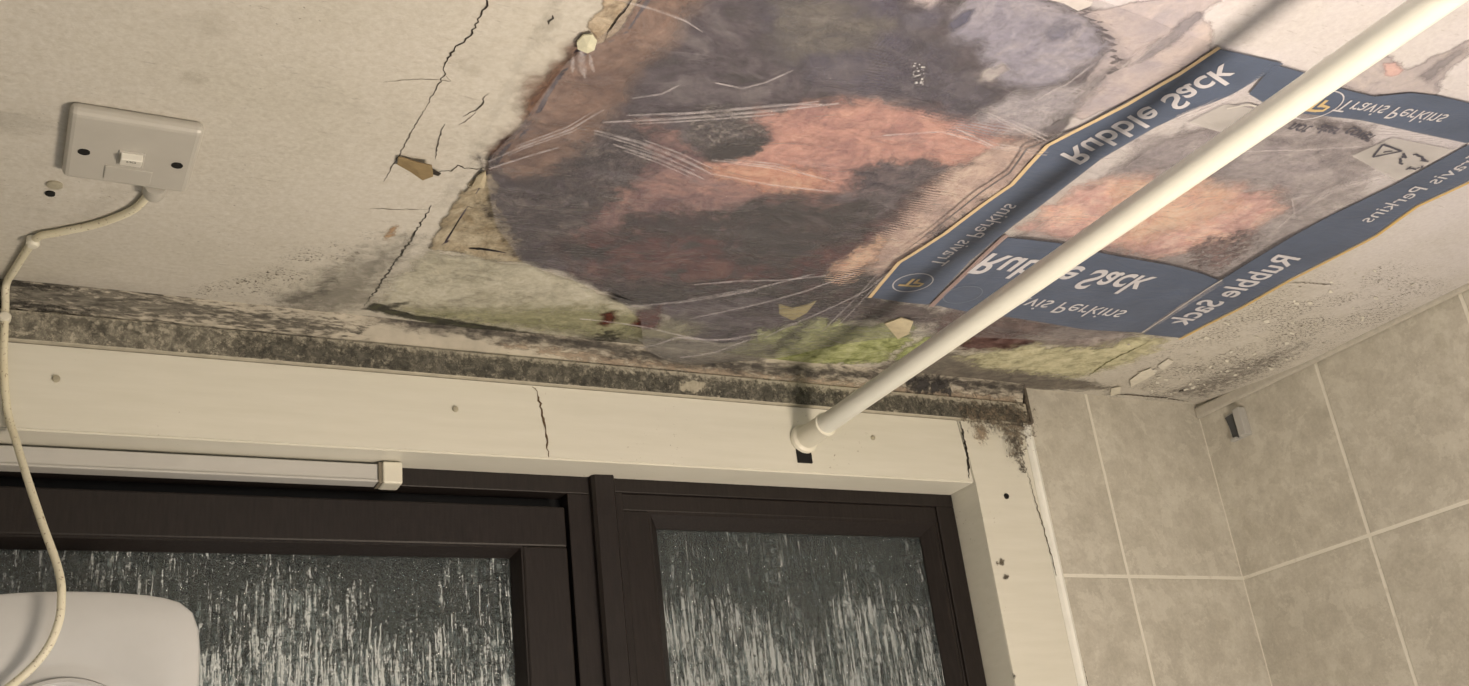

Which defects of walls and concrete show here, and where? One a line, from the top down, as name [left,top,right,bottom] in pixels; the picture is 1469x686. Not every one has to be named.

peeling [1344,40,1469,96]
crack [364,0,489,306]
flaking render [378,0,1221,344]
flaking render [960,113,1375,352]
leakage [0,247,933,407]
crack [533,387,549,457]
leakage [865,331,1168,473]
peeling [1111,267,1427,402]